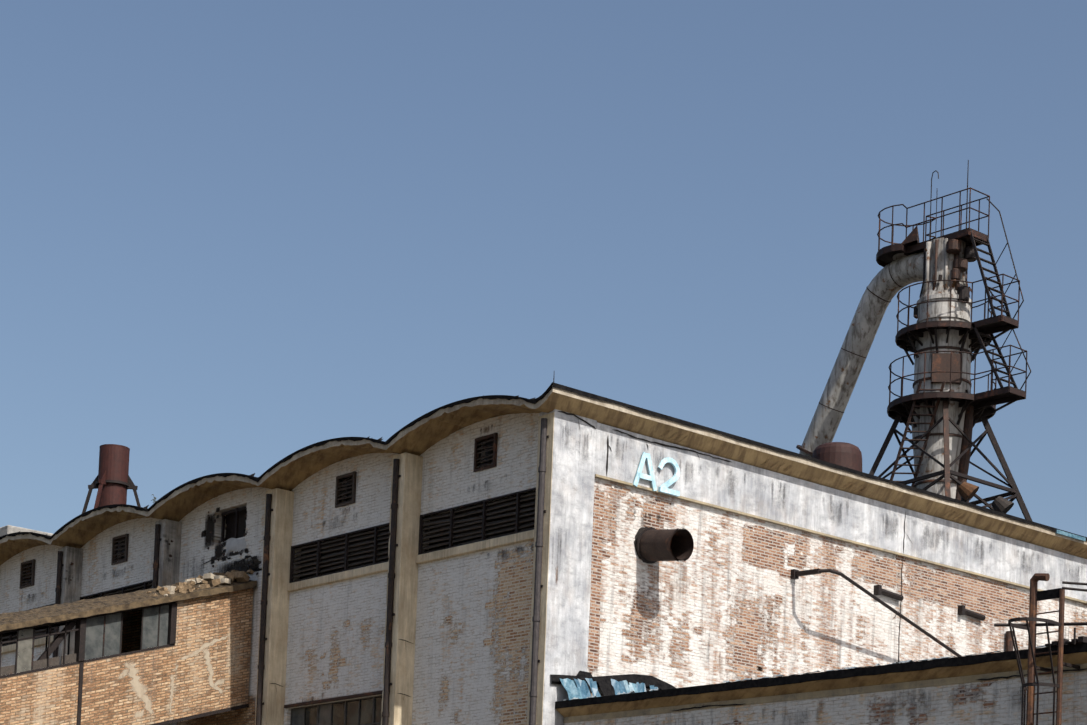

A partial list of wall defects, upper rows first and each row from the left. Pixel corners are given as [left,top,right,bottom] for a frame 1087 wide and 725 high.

spalling [201,507,258,575]
peeling [707,521,728,566]
peeling [483,540,534,725]
peeling [588,484,704,676]
peeling [722,524,807,682]
peeling [795,616,811,662]
peeling [826,546,1040,653]
peeling [1075,611,1087,639]
peeling [867,699,927,725]
peeling [948,680,998,708]